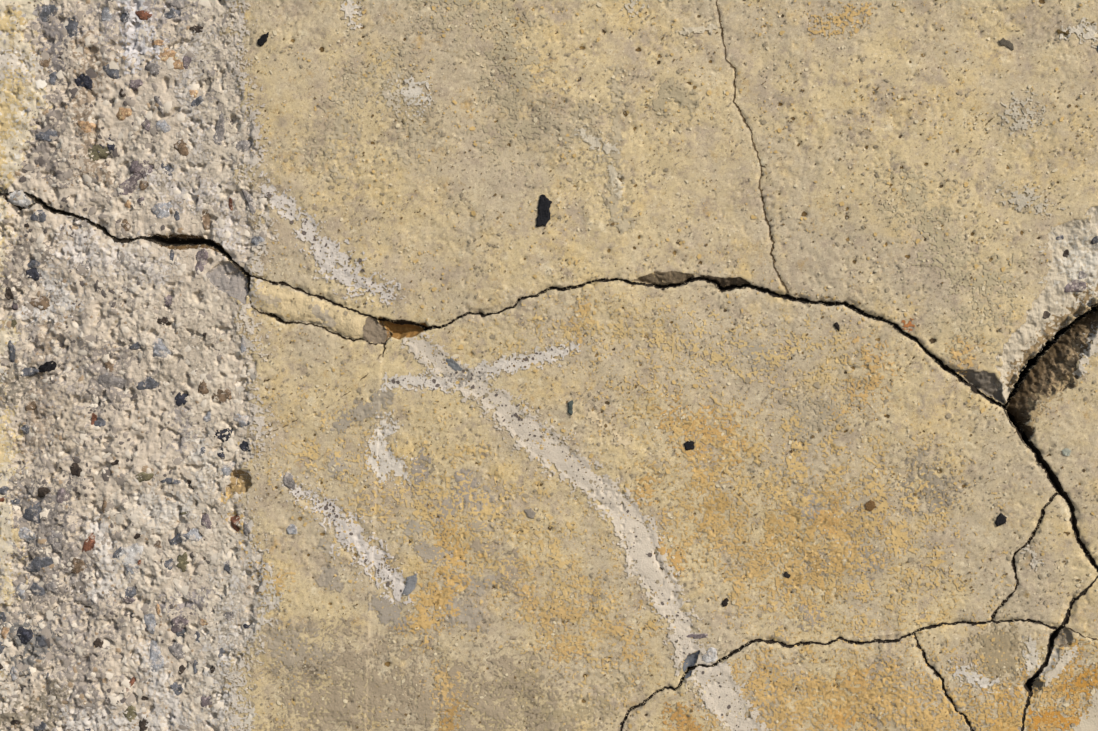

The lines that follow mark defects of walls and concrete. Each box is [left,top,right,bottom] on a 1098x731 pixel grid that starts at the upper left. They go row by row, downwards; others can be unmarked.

crack [716,0,789,293]
crack [12,192,1098,731]
spalling [953,206,1098,439]